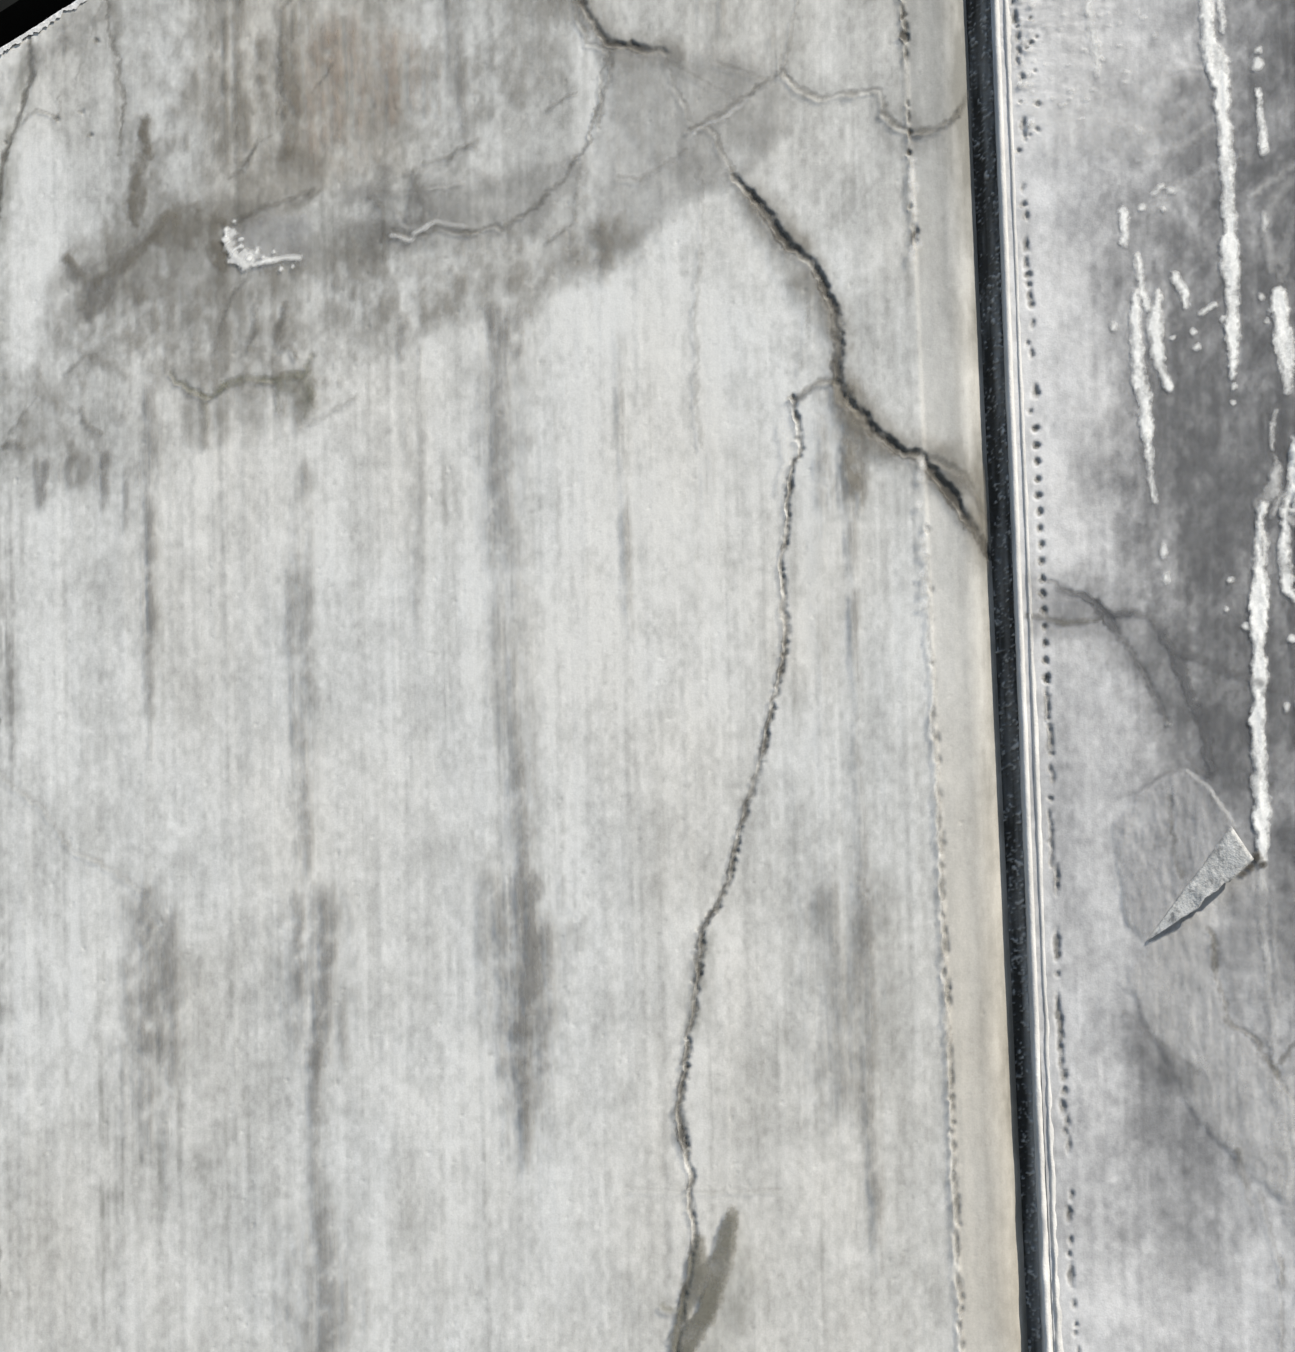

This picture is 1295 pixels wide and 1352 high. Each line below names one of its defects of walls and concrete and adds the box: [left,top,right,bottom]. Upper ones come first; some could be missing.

crack [578,0,648,69]
crack [0,41,32,199]
damp [1256,89,1268,154]
spalling [222,220,300,270]
damp [1112,0,1240,502]
damp [1260,287,1295,391]
crack [7,644,15,714]
crack [676,179,992,1305]
crack [1028,584,1215,777]
damp [1243,438,1295,863]
peeling [1147,826,1267,940]
damp [663,1208,738,1352]